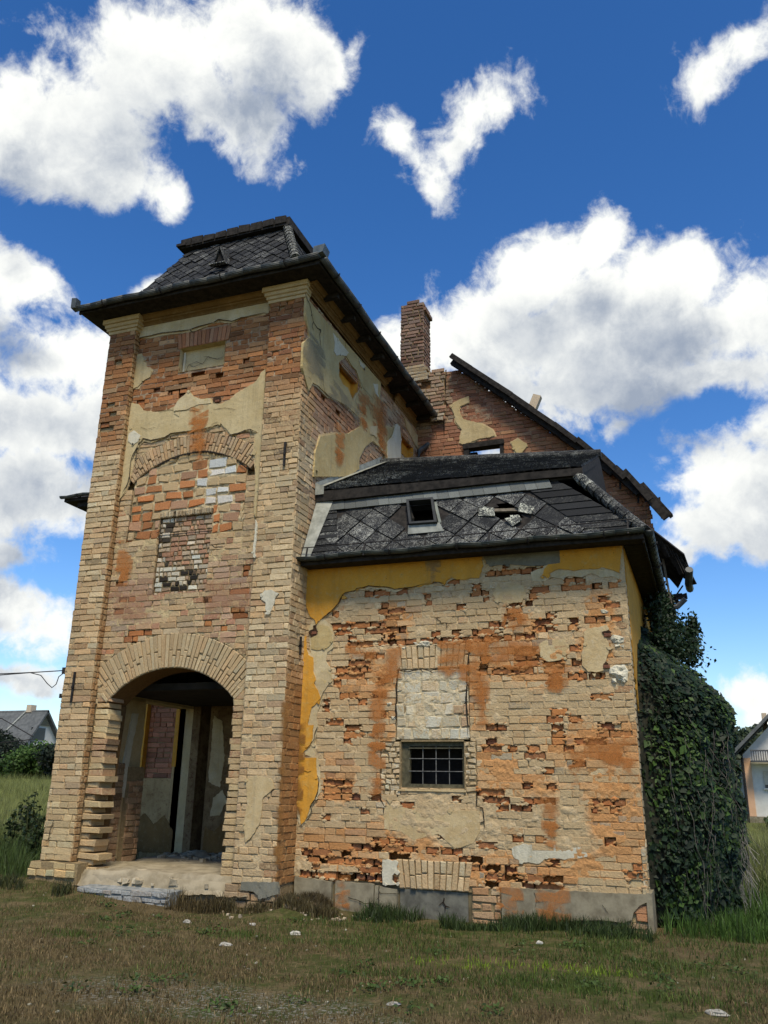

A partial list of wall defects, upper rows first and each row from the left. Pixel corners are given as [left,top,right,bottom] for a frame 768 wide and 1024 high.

crack [139,313,261,338]
flaking render [139,297,418,477]
flaking render [449,396,497,445]
flaking render [510,438,528,453]
flaking render [100,353,279,631]
flaking render [296,546,635,826]
spalling [299,833,588,890]
spalling [604,837,617,847]
spalling [621,862,649,891]